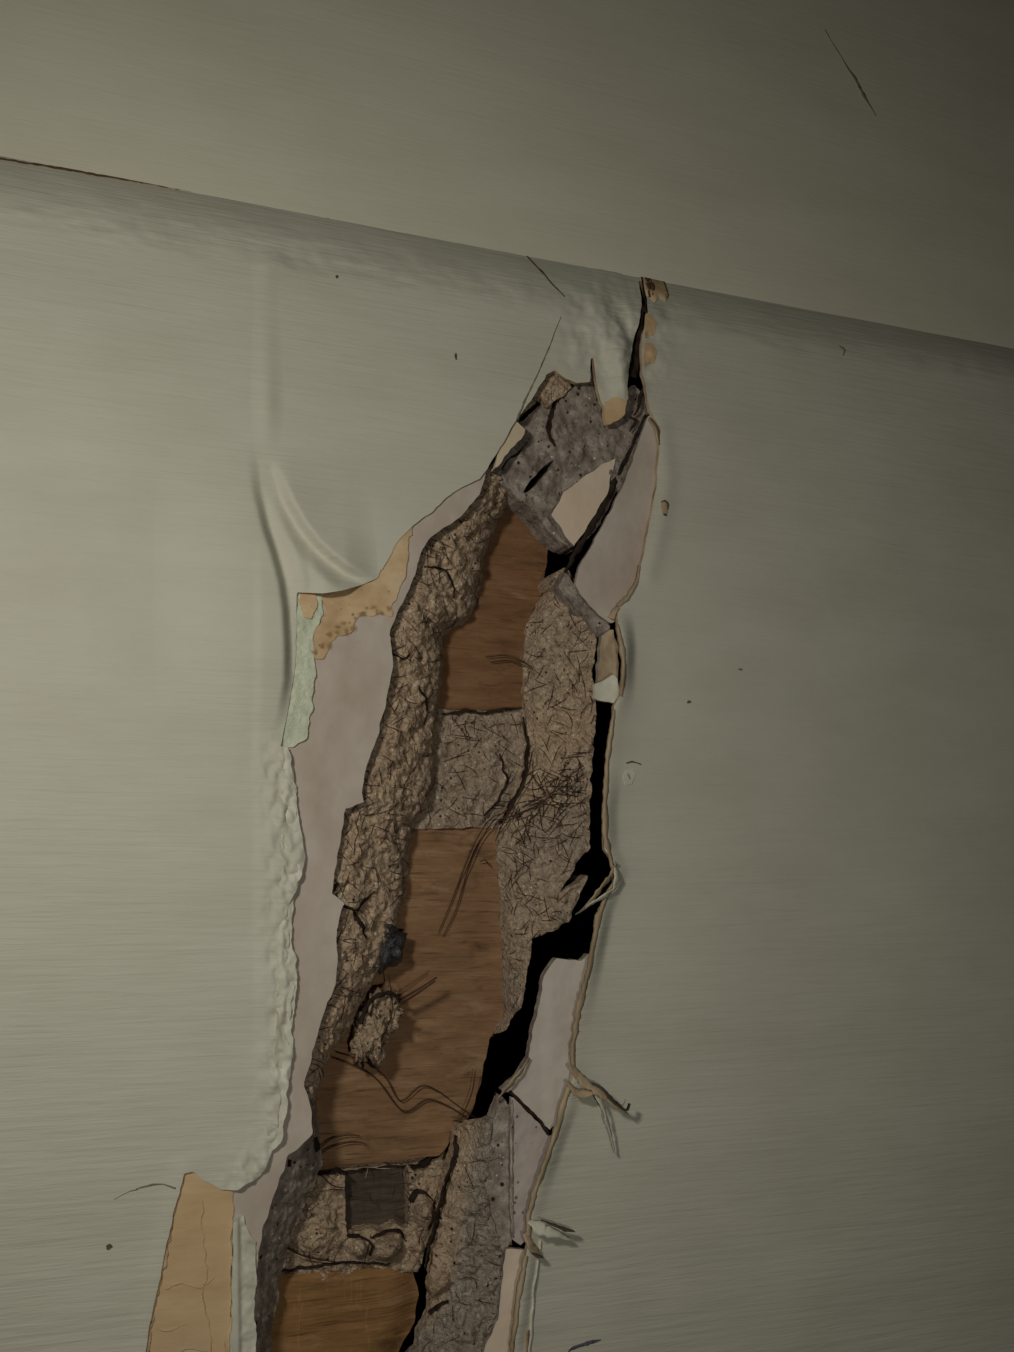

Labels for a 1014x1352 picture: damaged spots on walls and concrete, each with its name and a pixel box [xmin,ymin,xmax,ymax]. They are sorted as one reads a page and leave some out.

flaking render [146,369,669,1352]
crack [564,277,669,573]